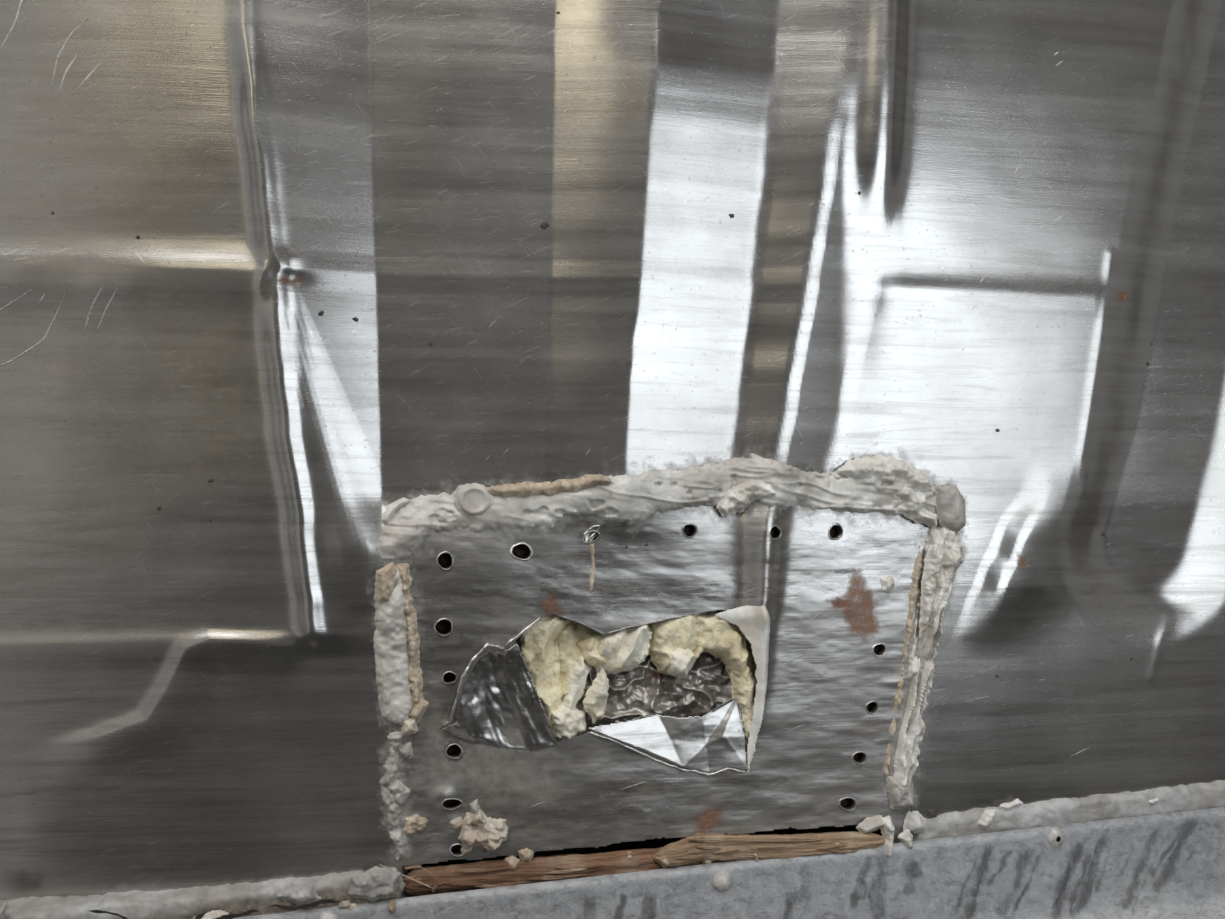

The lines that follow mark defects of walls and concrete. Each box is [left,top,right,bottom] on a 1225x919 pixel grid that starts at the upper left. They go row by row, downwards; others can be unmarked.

rust [832,575,877,635]